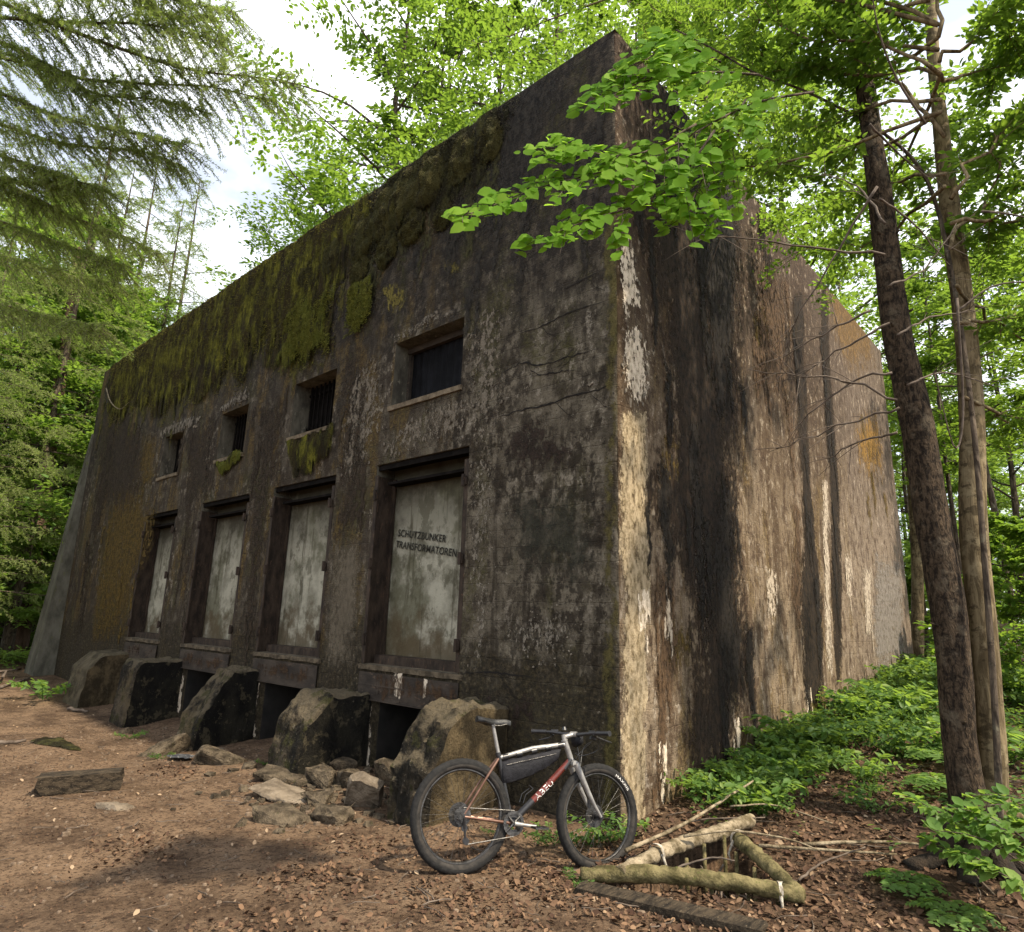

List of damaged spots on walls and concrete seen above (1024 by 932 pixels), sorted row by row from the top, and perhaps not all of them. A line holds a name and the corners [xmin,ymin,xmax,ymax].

crack [502,262,617,418]
water stain [620,64,875,809]